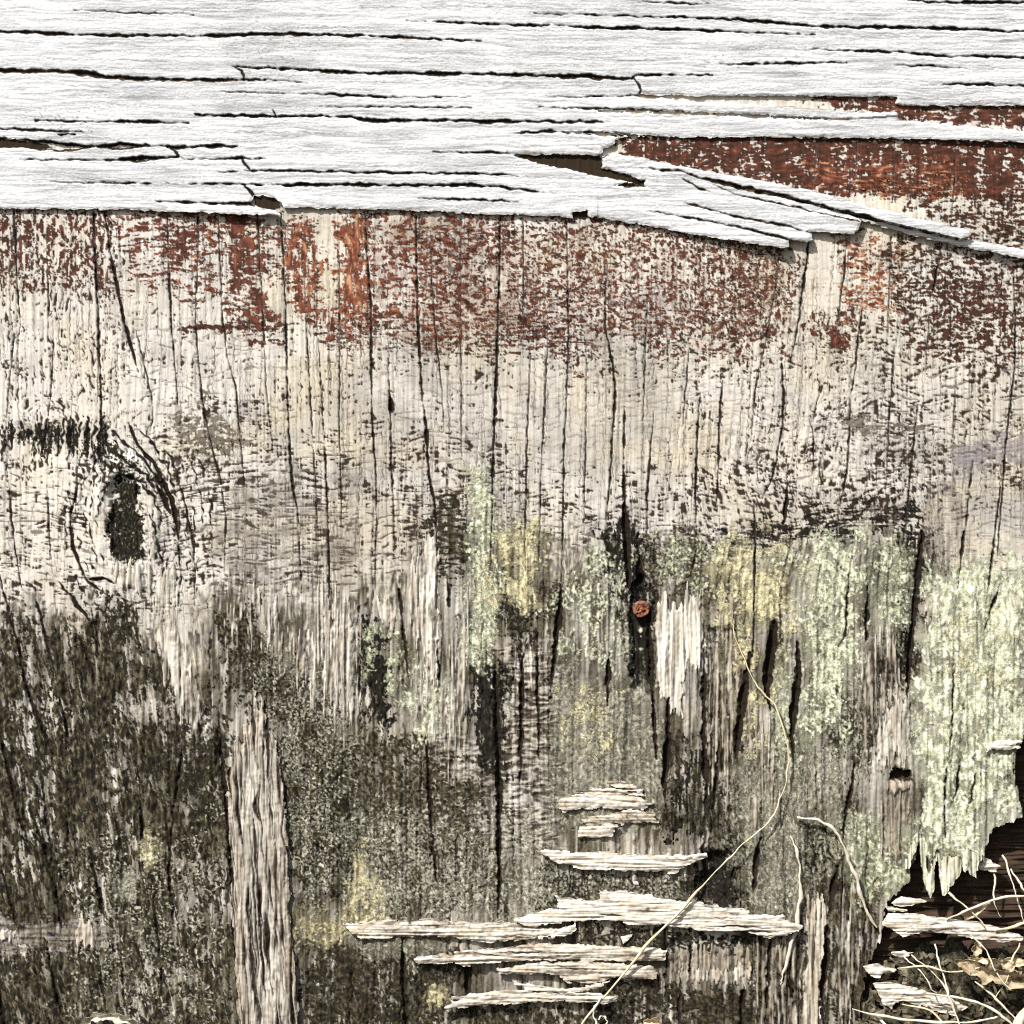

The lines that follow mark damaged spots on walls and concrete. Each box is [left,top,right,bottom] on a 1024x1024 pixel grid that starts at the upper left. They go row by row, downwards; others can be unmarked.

spalling [0,139,52,150]
spalling [254,196,283,210]
spalling [514,154,644,187]
spalling [572,211,591,219]
crack [0,0,1024,707]
crack [493,221,654,918]
crack [650,142,958,839]
leakage [0,572,566,1024]
peeling [557,780,659,838]
leakage [295,480,954,1024]
peeling [343,849,968,1024]
peeling [882,896,1024,942]